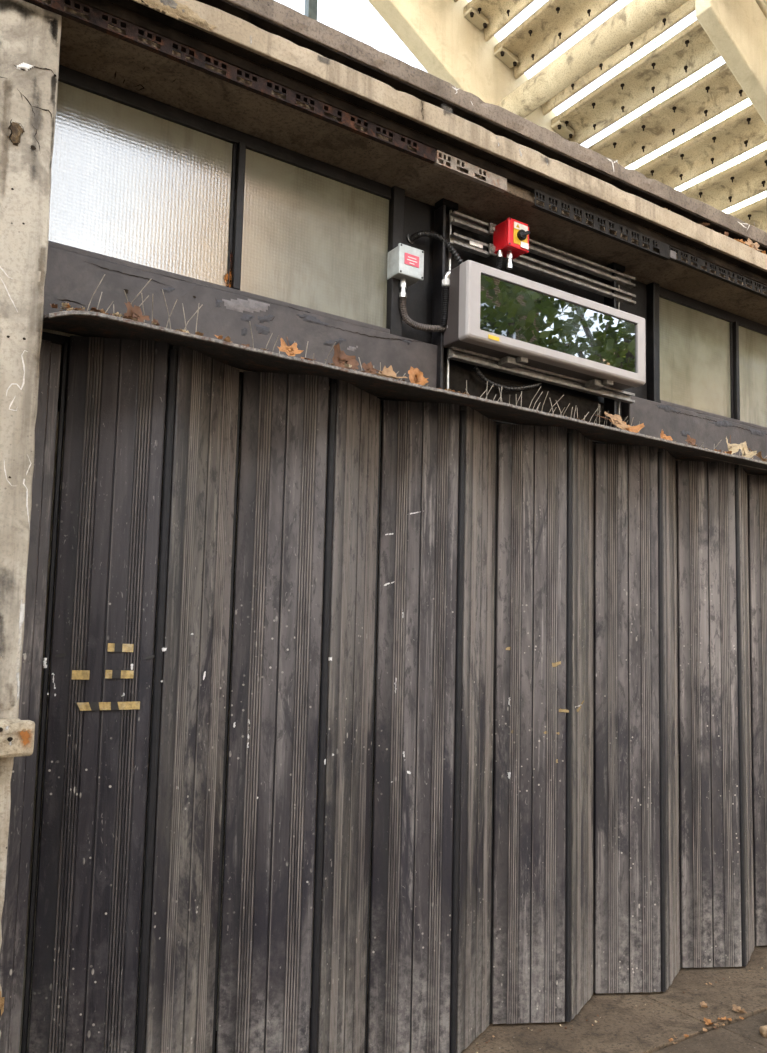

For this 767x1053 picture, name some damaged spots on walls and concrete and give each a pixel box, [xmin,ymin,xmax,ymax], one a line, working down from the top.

spalling [134,0,217,31]